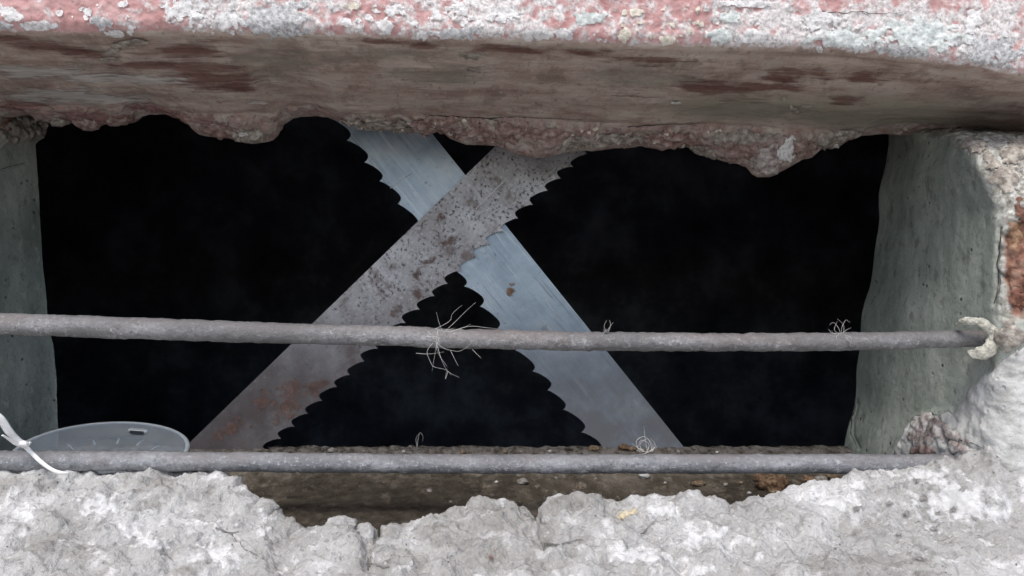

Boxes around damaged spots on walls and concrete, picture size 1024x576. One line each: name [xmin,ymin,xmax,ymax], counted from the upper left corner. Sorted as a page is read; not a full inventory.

peeling [0,0,136,38]
damp [362,40,437,49]
damp [475,45,543,54]
peeling [158,0,1024,74]
damp [567,50,685,67]
damp [0,36,269,125]
damp [673,69,831,95]
damp [848,72,887,83]
spalling [0,115,135,145]
spalling [199,122,273,144]
spalling [339,113,862,177]
spalling [906,412,971,455]